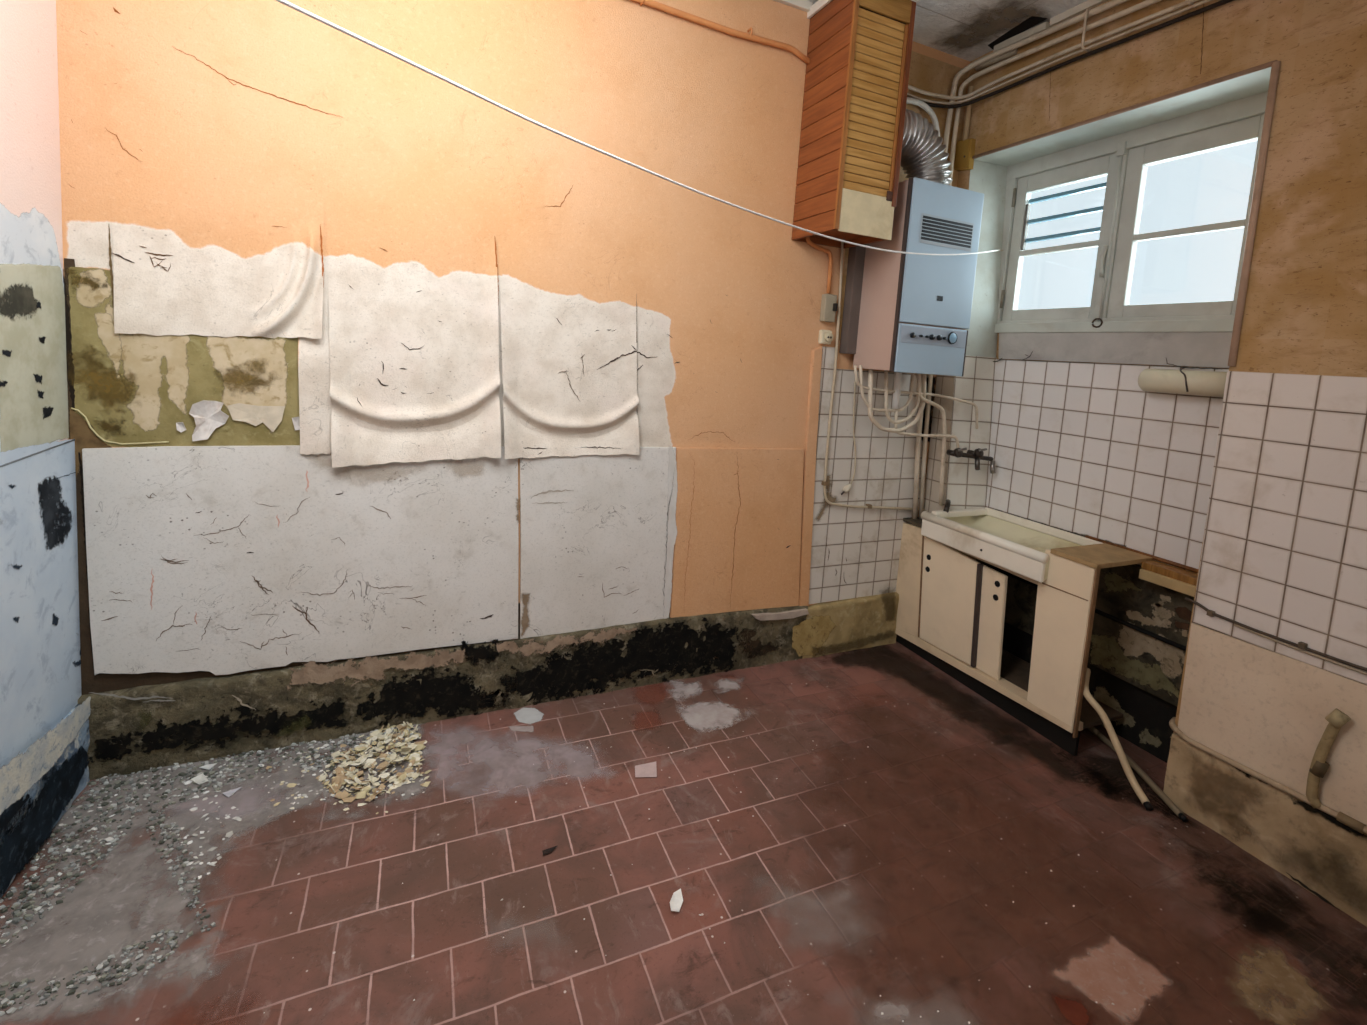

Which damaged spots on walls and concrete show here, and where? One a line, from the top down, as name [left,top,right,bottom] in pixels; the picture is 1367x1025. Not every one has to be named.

leakage [942,0,1046,51]
crack [175,48,341,117]
peeling [353,236,695,619]
peeling [0,203,465,815]
leakage [521,594,530,636]
spalling [483,603,637,656]
peeling [1114,595,1188,683]
peeling [1092,686,1172,748]
leakage [0,617,782,897]
leakage [1192,759,1267,834]
leakage [1292,799,1367,837]
leakage [1282,850,1367,908]